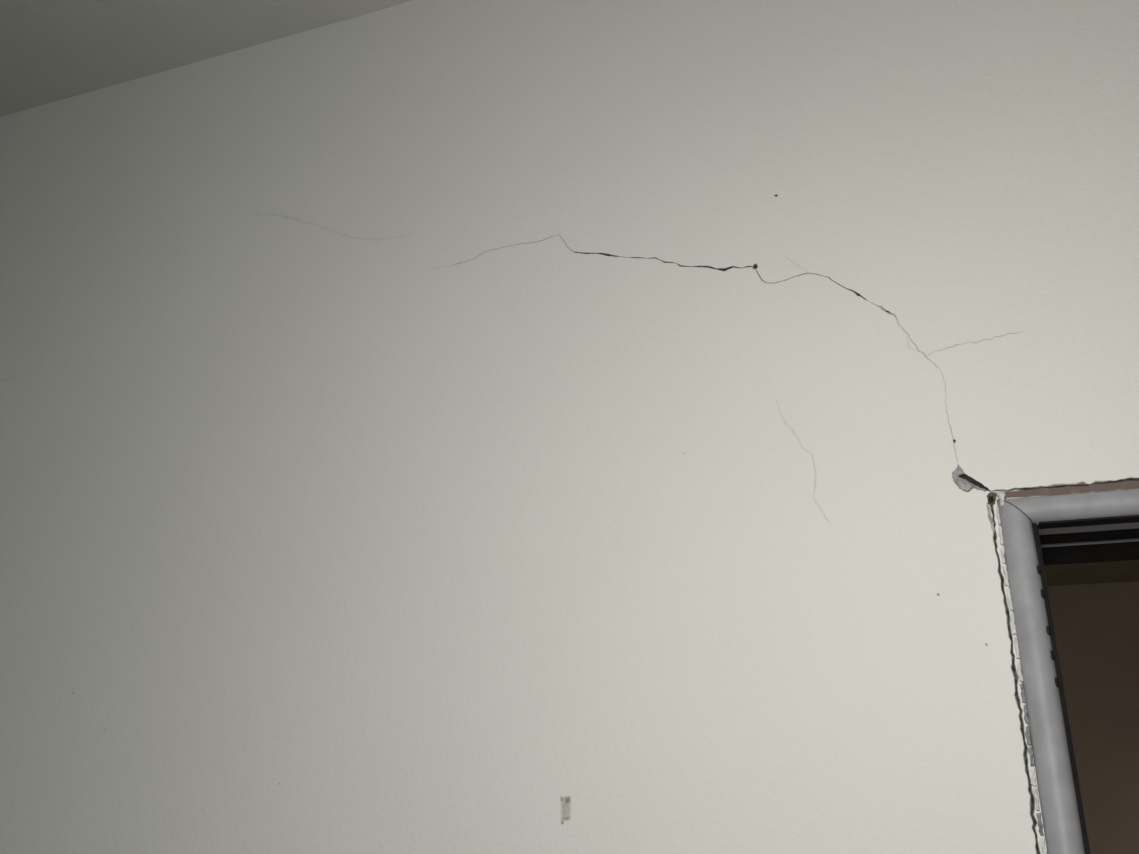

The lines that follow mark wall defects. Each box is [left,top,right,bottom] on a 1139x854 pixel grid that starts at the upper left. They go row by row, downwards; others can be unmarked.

crack [575,252,889,312]